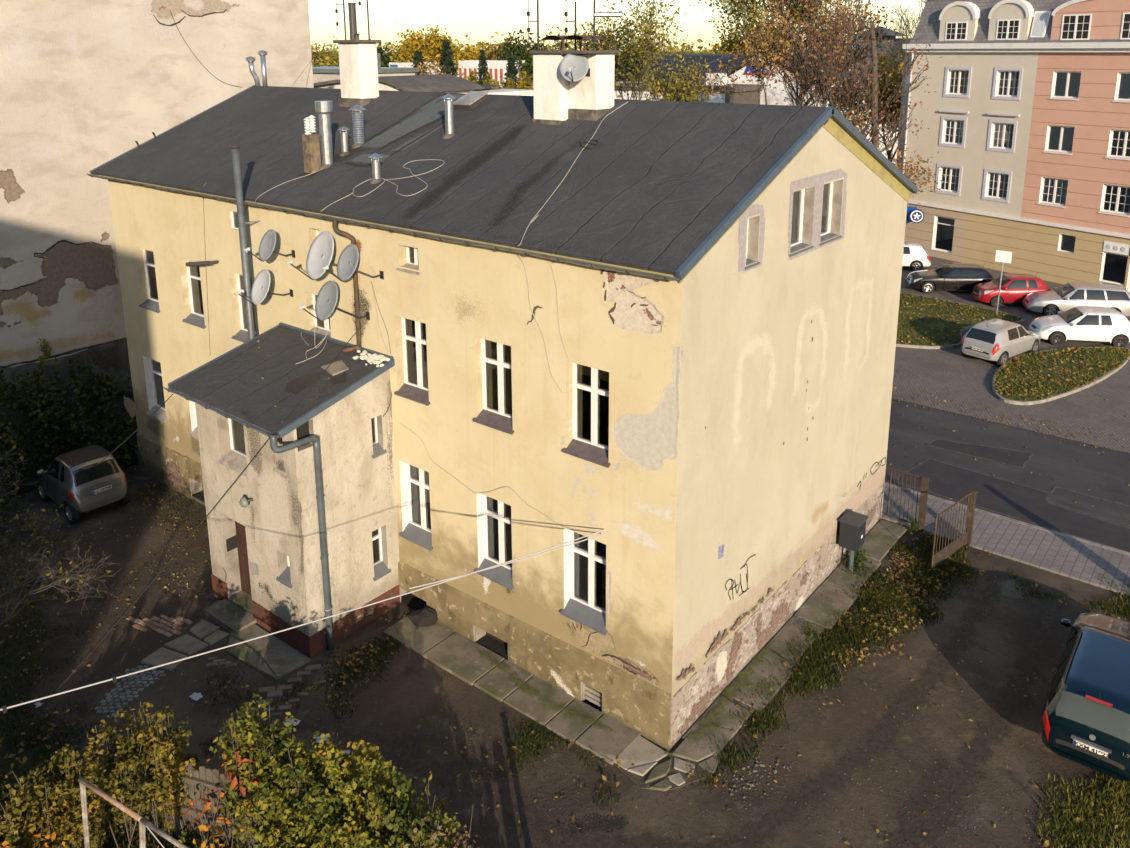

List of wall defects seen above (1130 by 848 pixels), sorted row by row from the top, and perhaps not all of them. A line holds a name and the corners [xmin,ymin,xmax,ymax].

flaking render [0,169,25,204]
leakage [361,123,639,262]
flaking render [0,231,118,328]
crack [527,305,543,325]
peeling [600,269,665,335]
flaking render [565,617,660,685]
flaking render [678,588,791,736]